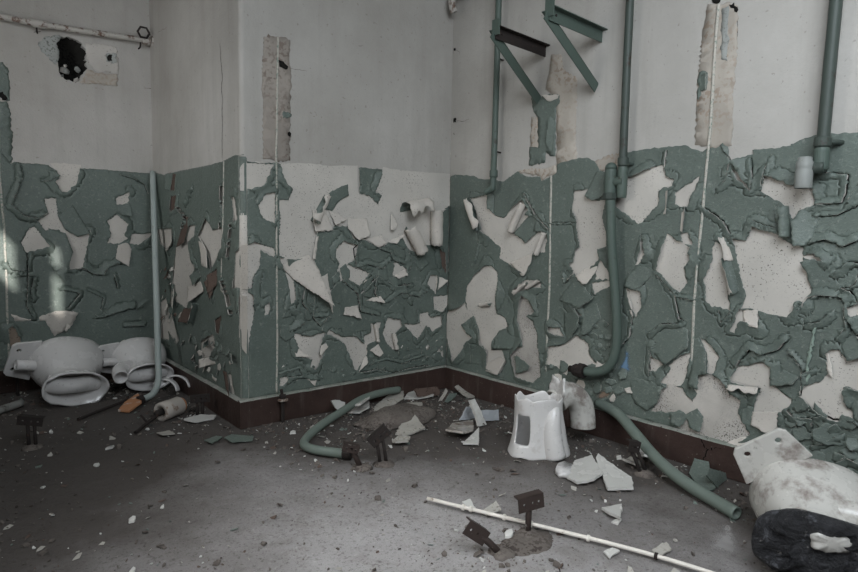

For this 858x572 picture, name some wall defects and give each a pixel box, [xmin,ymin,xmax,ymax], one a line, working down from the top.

peeling [0,31,858,466]
flaking render [694,2,739,148]